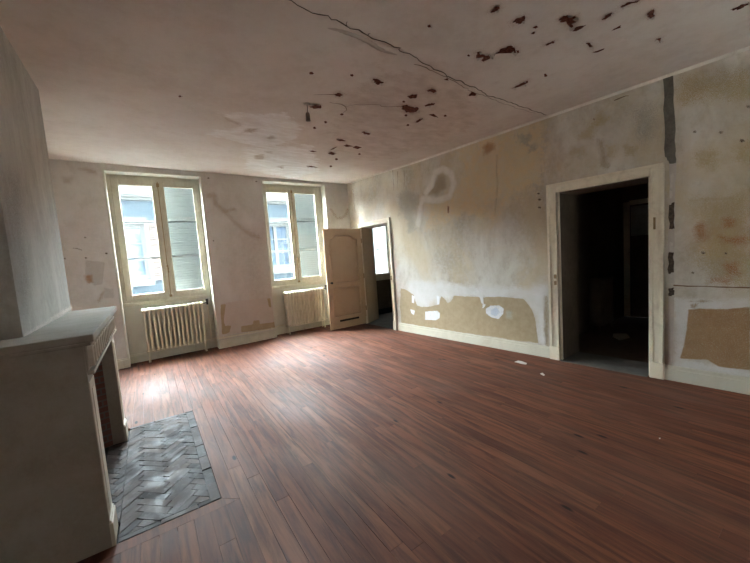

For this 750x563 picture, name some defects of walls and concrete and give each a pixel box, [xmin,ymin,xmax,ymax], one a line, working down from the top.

spalling [539,10,585,48]
spalling [597,0,641,21]
crack [290,0,545,115]
spalling [467,44,521,63]
spalling [397,87,446,126]
peeling [663,76,750,370]
peeling [400,288,538,343]